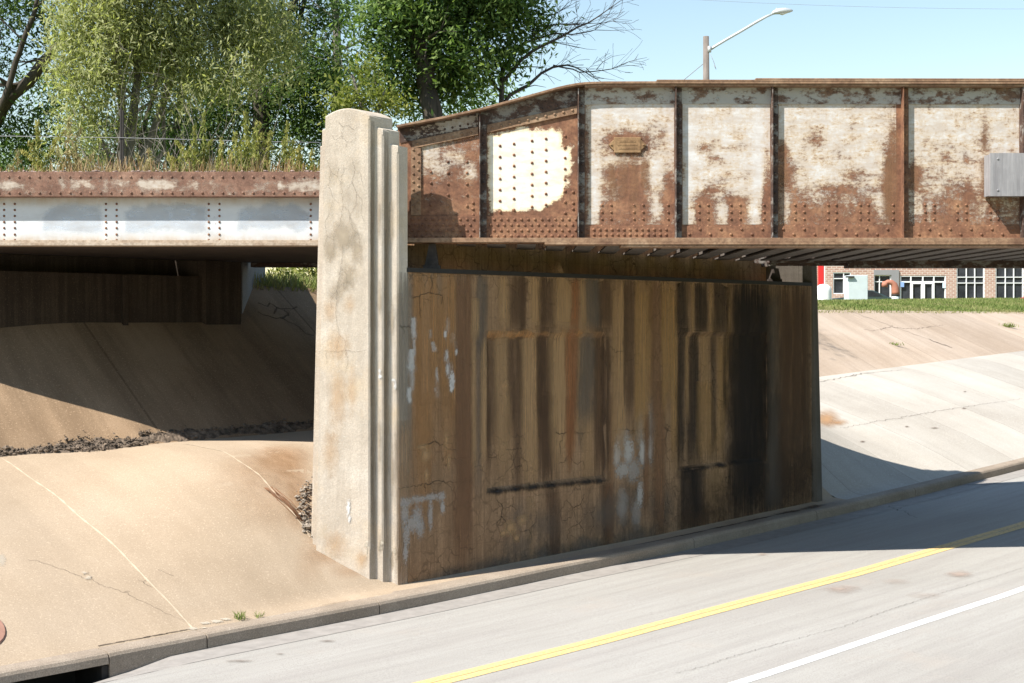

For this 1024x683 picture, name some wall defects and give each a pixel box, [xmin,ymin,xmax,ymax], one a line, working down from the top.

leakage [489,276,820,558]